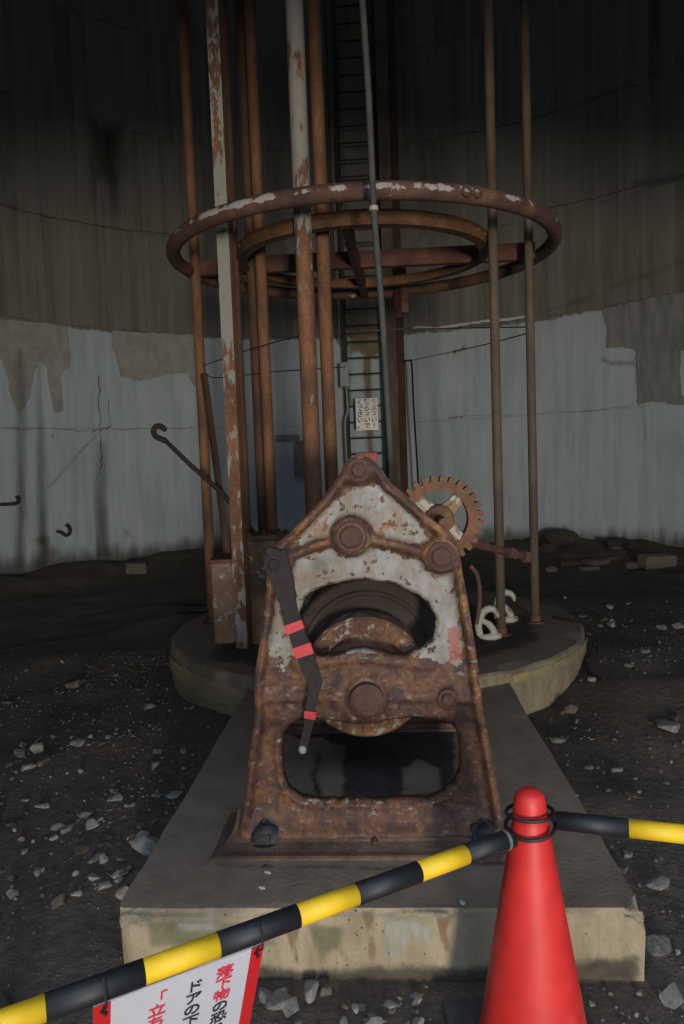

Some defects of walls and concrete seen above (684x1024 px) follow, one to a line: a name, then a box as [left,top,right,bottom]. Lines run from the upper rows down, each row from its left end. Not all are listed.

peeling [0,320,71,413]
peeling [112,330,196,386]
peeling [602,293,684,405]
crack [2,375,186,475]